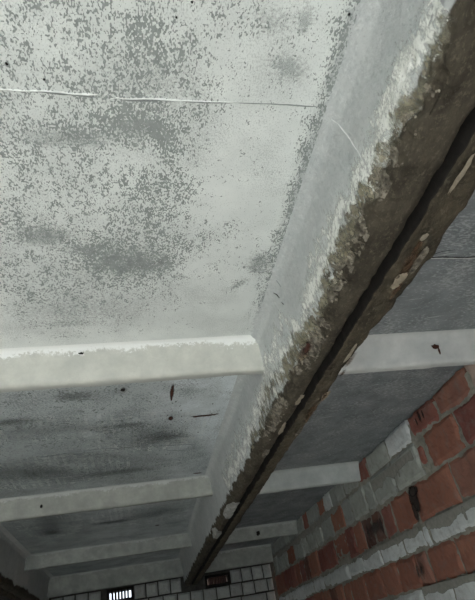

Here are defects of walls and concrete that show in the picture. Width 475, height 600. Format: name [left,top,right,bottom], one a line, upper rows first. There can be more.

crack [0,88,320,108]
crack [331,119,369,165]
spalling [448,154,475,193]
spalling [320,95,429,303]
leakage [223,0,449,490]
crack [431,250,475,259]
spalling [293,308,331,375]
peeling [0,380,189,450]
spalling [263,395,304,440]
spalling [223,502,240,519]